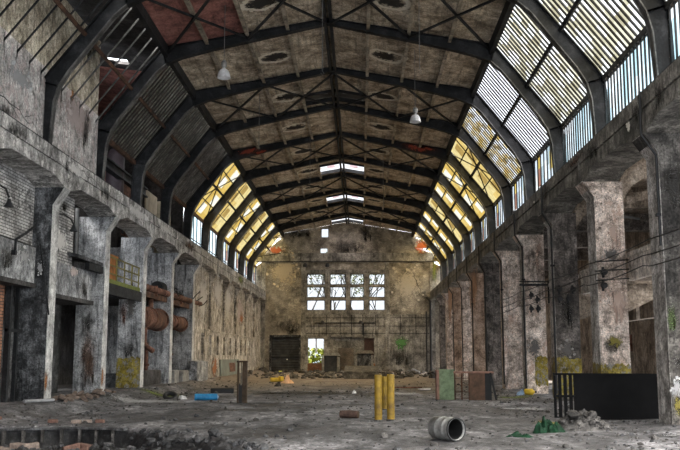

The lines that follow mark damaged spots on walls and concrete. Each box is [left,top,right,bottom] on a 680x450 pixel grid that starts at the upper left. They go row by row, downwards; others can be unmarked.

rust [81,334,104,385]